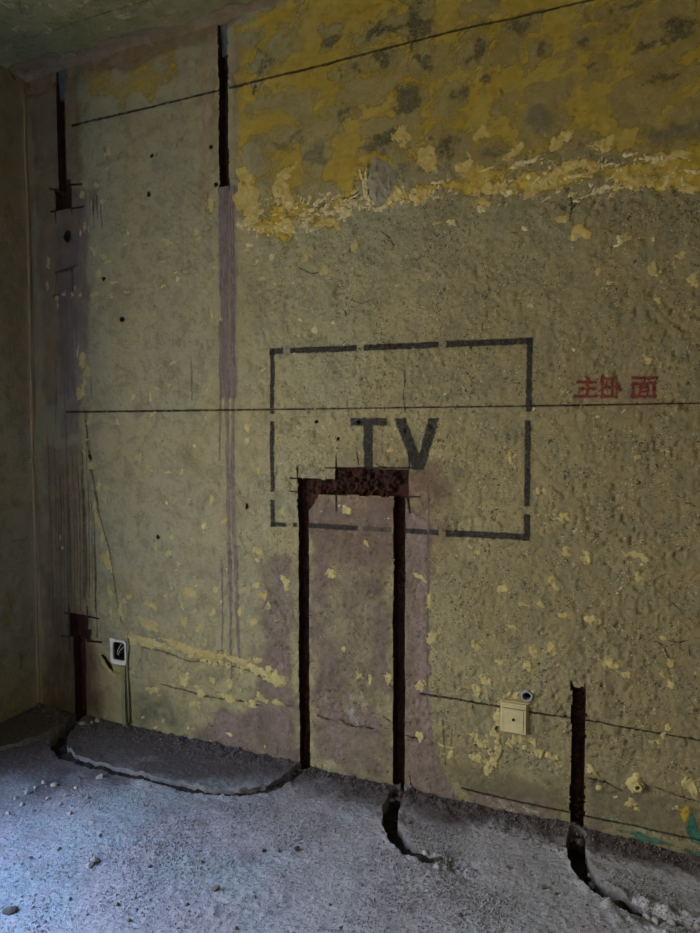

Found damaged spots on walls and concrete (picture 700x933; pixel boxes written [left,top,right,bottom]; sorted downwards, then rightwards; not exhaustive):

peeling [232,0,700,252]